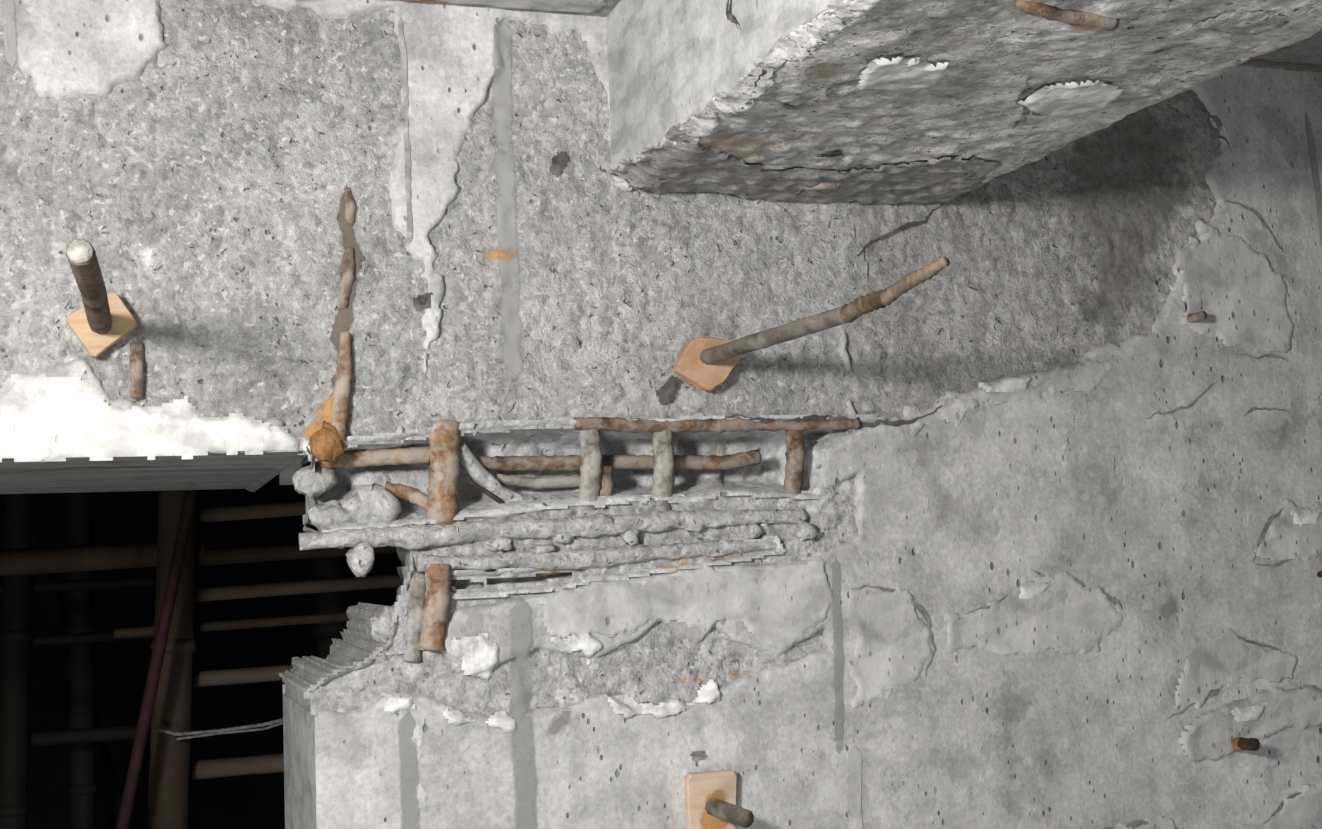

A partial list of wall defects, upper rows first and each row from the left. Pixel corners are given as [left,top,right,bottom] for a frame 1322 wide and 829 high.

crack [1186,90,1233,154]
spalling [0,0,436,471]
leakage [1069,114,1183,317]
crack [1226,201,1286,254]
spalling [298,0,1297,732]
rust [303,394,333,437]
crack [1143,382,1217,419]
crack [1252,507,1292,567]
crack [1222,630,1296,669]
crack [1167,677,1243,719]
rust [701,790,727,829]
crack [1263,792,1302,824]